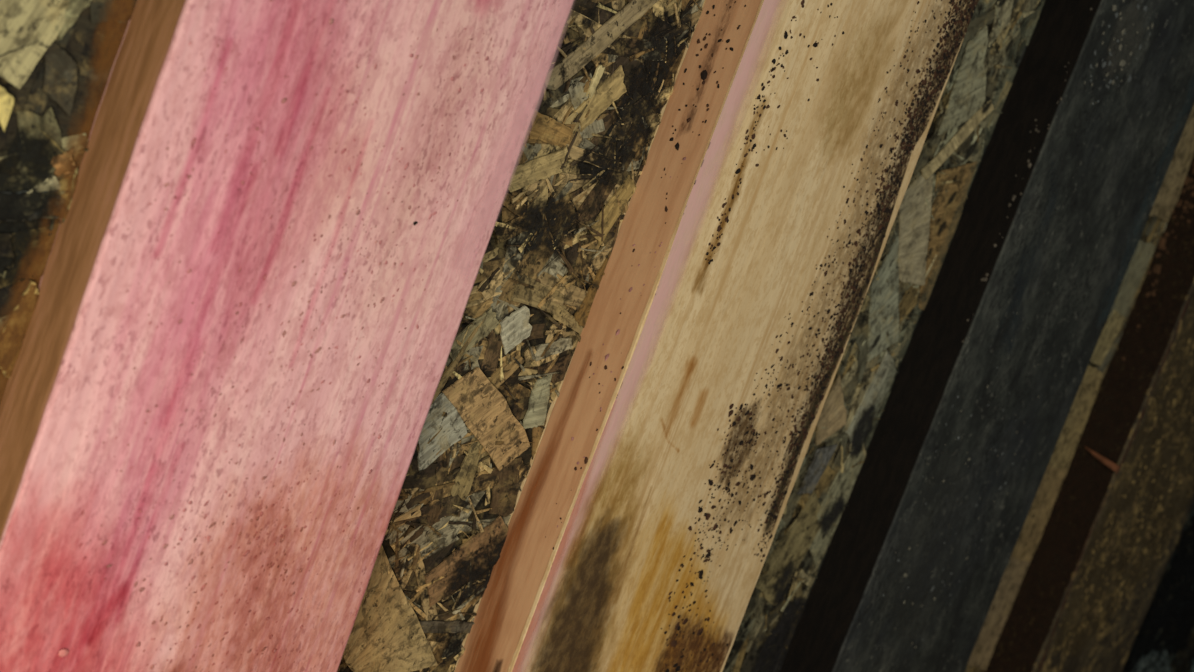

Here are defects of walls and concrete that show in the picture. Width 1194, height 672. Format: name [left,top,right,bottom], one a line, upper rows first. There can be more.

water stain [0,0,241,539]
water stain [434,0,844,672]
water stain [752,0,1153,672]
water stain [984,157,1194,672]